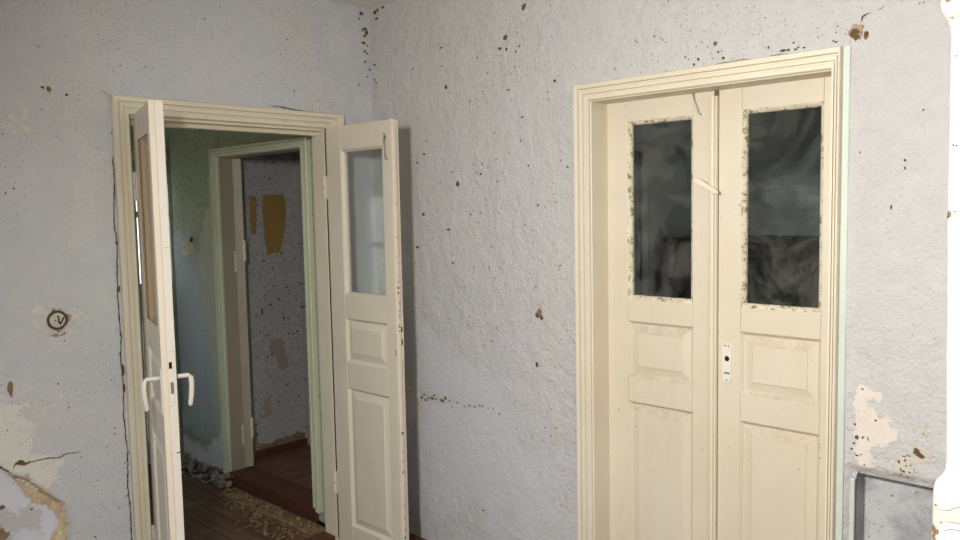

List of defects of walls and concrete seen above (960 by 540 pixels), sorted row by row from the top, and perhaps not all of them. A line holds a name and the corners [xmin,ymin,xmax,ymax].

peeling [249,194,286,254]
peeling [0,381,78,540]
peeling [850,383,899,471]
peeling [892,422,932,480]
peeling [932,475,960,540]